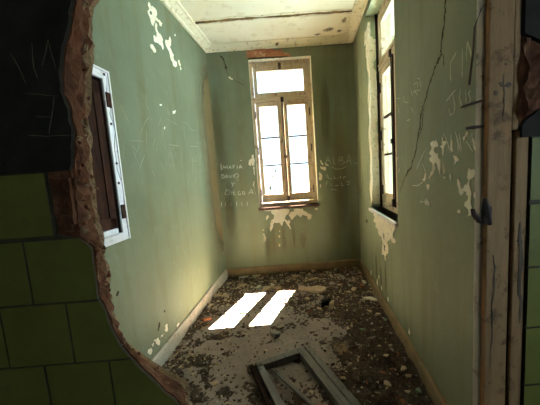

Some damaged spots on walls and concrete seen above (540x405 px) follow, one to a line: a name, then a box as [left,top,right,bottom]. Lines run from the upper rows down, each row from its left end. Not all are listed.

peeling [147,2,182,70]
peeling [364,21,380,204]
crack [400,0,446,191]
peeling [420,138,475,217]
peeling [263,208,318,247]
peeling [366,213,396,261]
peeling [132,322,168,355]